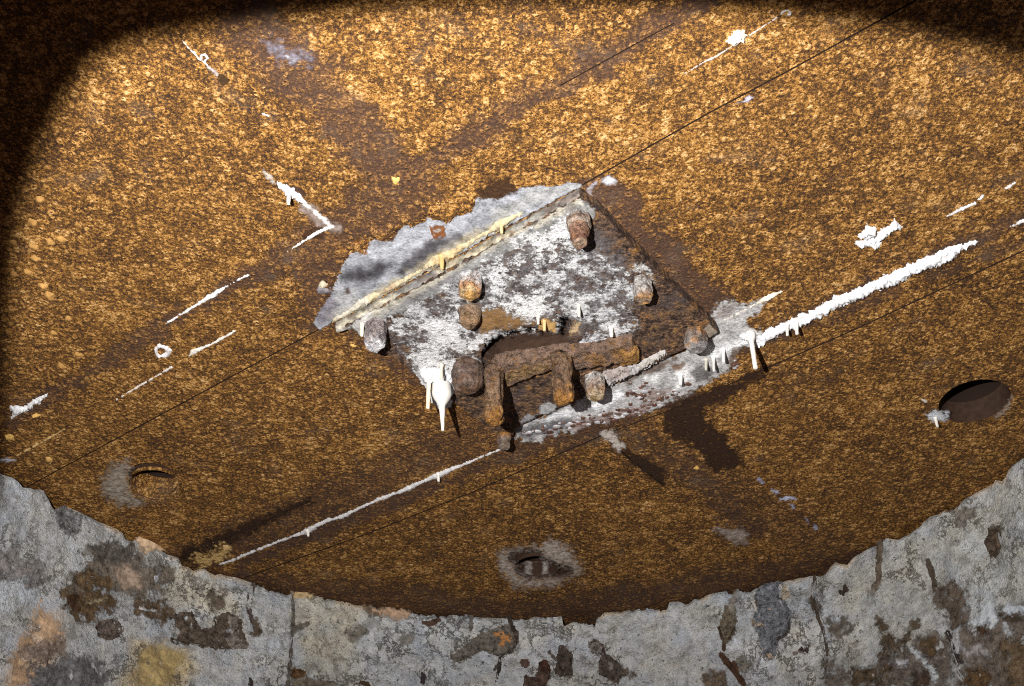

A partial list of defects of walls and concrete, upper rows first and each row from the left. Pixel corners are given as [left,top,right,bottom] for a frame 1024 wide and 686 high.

leakage [182,40,219,76]
leakage [684,10,791,74]
leakage [263,170,342,249]
peeling [313,182,582,329]
leakage [855,218,903,250]
leakage [166,274,249,324]
rust [478,306,639,388]
leakage [514,240,978,484]
leakage [9,393,48,419]
leakage [181,497,316,560]
leakage [219,449,500,565]
leakage [525,561,548,575]